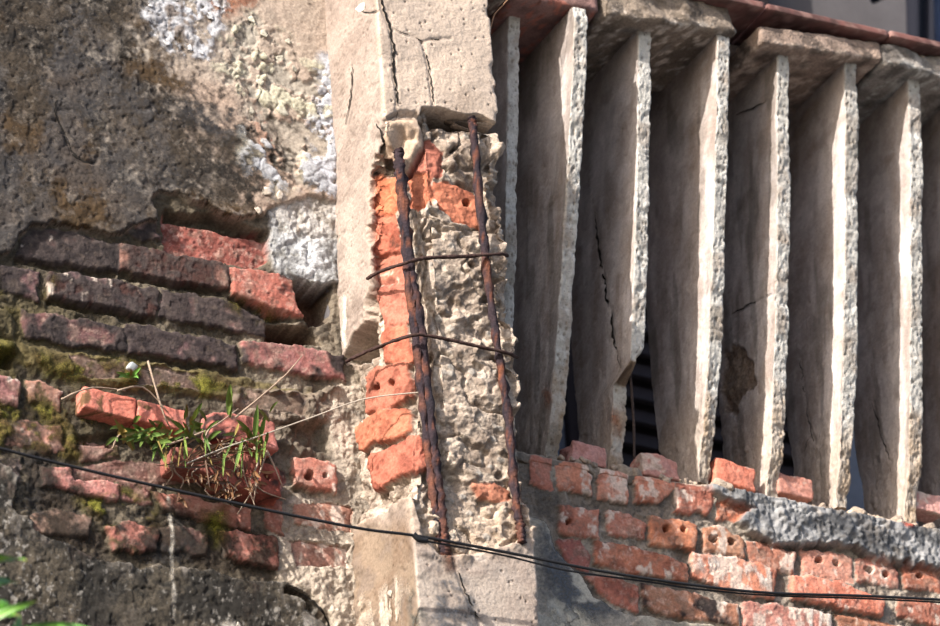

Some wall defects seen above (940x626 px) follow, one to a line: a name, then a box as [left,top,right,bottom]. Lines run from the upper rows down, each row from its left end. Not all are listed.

crack [54,101,93,163]
water stain [0,0,292,256]
crack [362,0,439,149]
spalling [0,50,521,626]
crack [595,217,620,365]
spalling [720,343,758,420]
spalling [515,449,940,626]